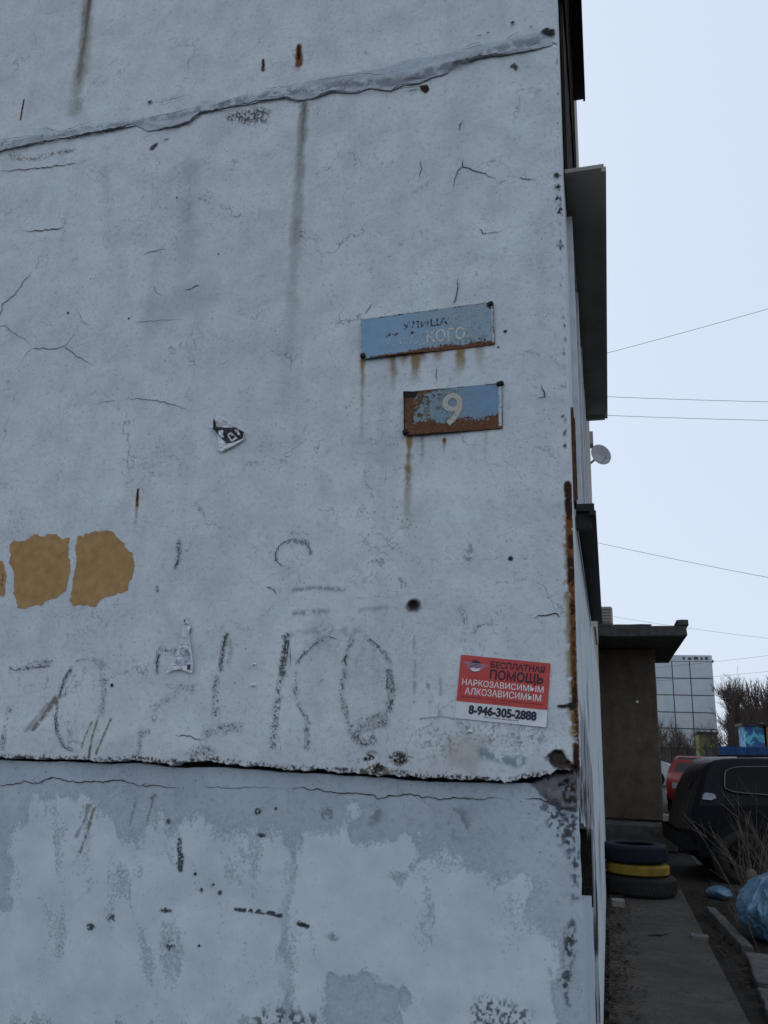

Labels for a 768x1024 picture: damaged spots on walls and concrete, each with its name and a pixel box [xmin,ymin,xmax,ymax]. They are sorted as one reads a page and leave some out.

crack [453,159,530,186]
crack [0,260,93,365]
rust [564,481,580,771]
crack [2,777,174,788]
crack [205,786,496,800]
spalling [516,689,601,883]
peeling [564,920,577,957]